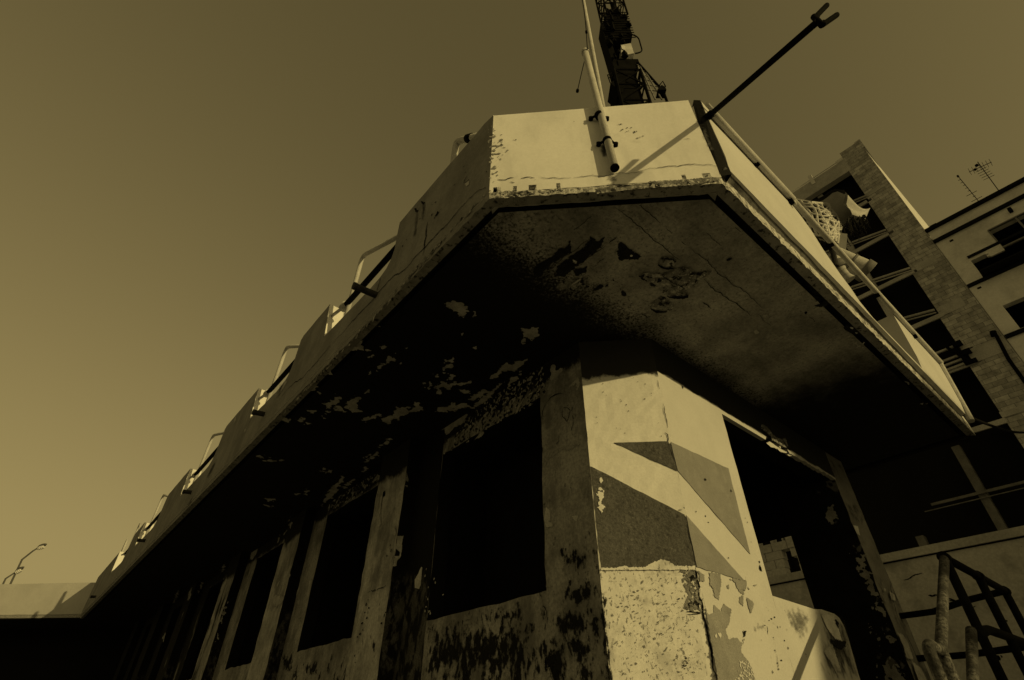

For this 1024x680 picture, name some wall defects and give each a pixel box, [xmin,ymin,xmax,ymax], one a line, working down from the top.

spalling [597,177,719,194]
peeling [444,301,476,318]
peeling [521,327,539,344]
spalling [534,236,626,296]
spalling [616,242,641,261]
crack [548,204,771,326]
spalling [639,266,712,313]
peeling [282,358,563,454]
peeling [320,438,393,511]
peeling [596,477,605,513]
damp [393,429,613,680]
peeling [601,559,756,680]